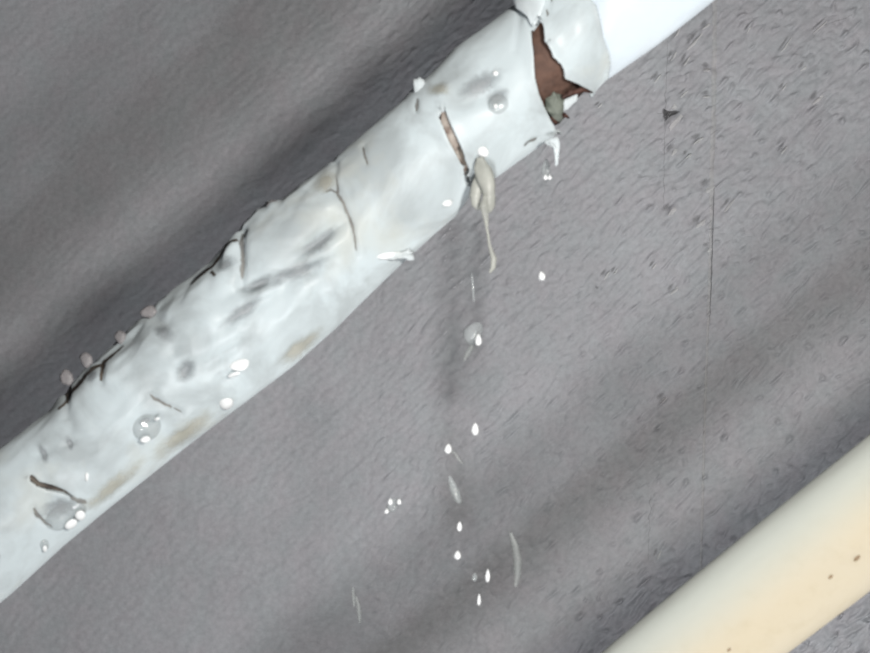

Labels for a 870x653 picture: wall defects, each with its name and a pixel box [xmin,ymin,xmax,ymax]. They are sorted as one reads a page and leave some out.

crack [441,111,468,175]